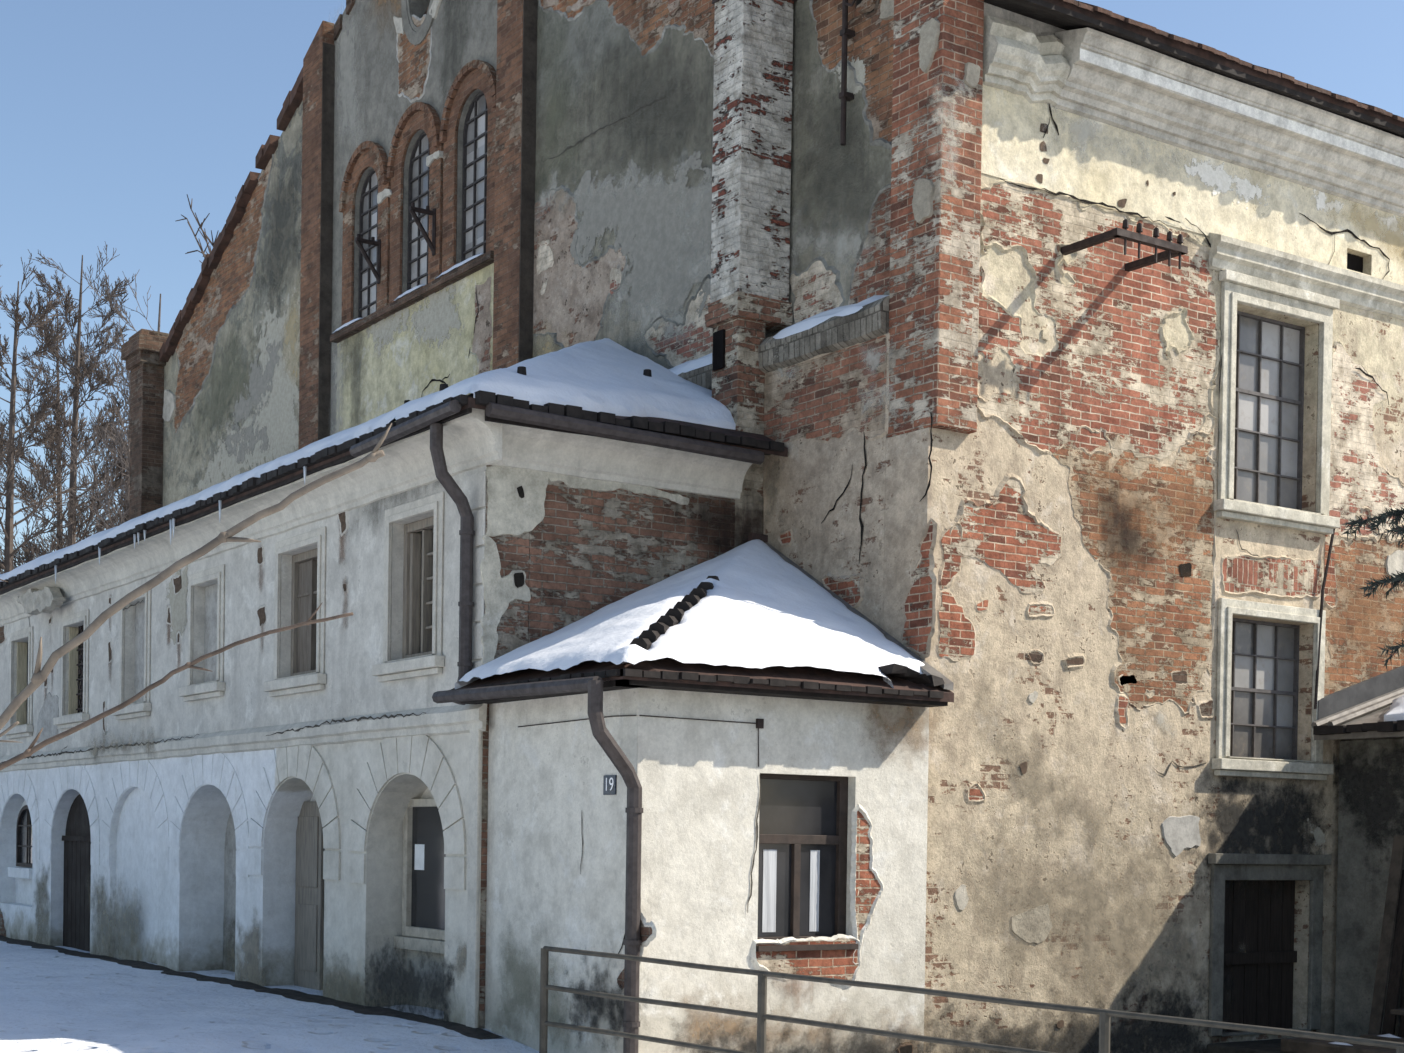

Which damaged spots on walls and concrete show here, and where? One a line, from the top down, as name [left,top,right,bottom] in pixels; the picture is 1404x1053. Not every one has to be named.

flaking render [539,0,715,58]
flaking render [174,154,274,435]
crack [421,374,450,397]
flaking render [533,185,627,349]
flaking render [643,274,713,369]
crack [822,434,867,562]
crack [919,412,933,502]
flaking render [977,141,1404,732]
crack [1300,213,1390,279]
flaking render [901,473,1062,663]
water stain [1193,744,1404,870]
flaking render [750,803,884,992]